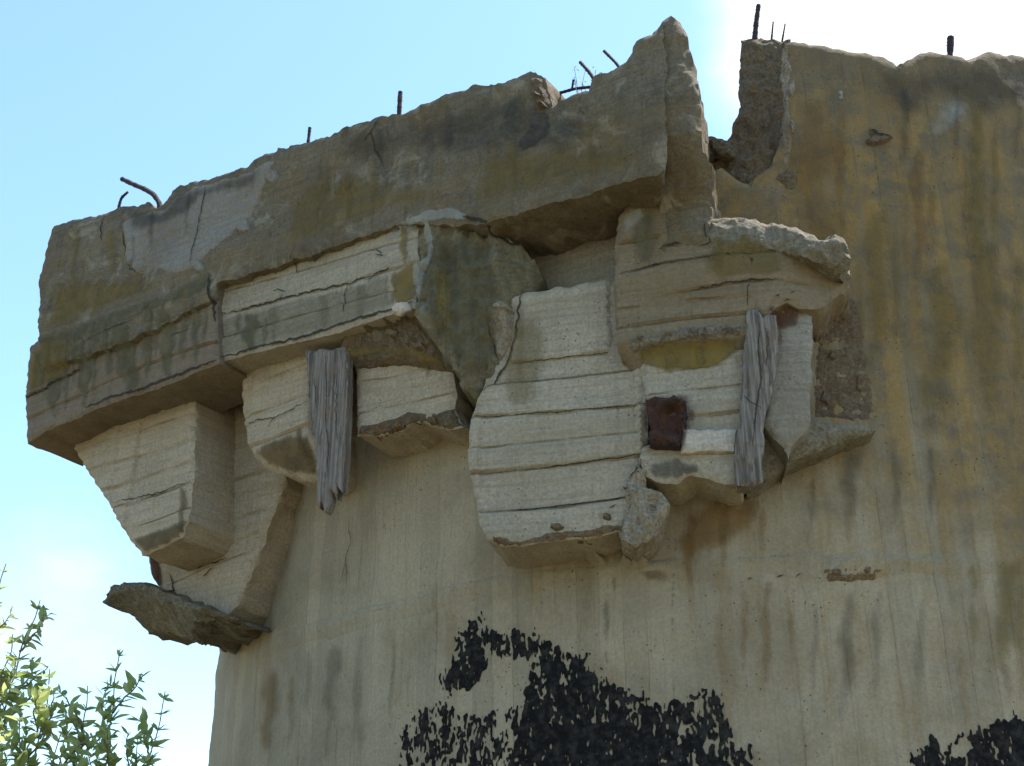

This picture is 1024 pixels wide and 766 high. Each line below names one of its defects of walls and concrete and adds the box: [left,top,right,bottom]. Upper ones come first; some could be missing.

peeling [752,4,796,164]
crack [26,369,80,398]
crack [85,192,413,474]
corrosion [646,396,688,444]
spalling [814,294,873,421]